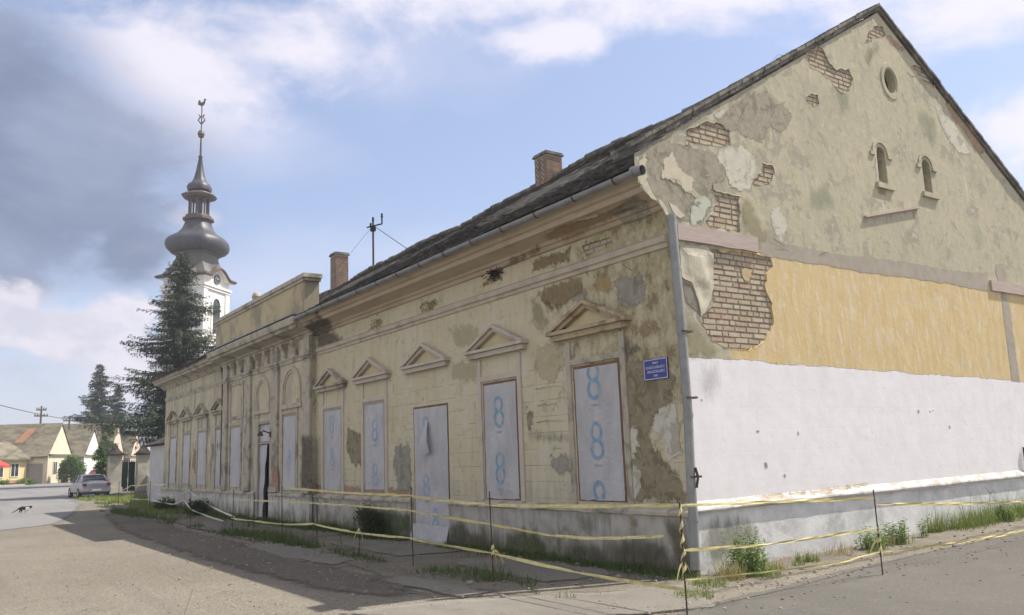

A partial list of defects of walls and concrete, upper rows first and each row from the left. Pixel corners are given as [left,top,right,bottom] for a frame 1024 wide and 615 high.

flaking render [864,25,903,51]
flaking render [799,45,853,95]
flaking render [806,92,820,108]
flaking render [608,90,792,233]
flaking render [683,247,774,352]
flaking render [346,428,361,467]
flaking render [393,444,412,491]
flaking render [550,453,570,474]
flaking render [626,359,687,504]